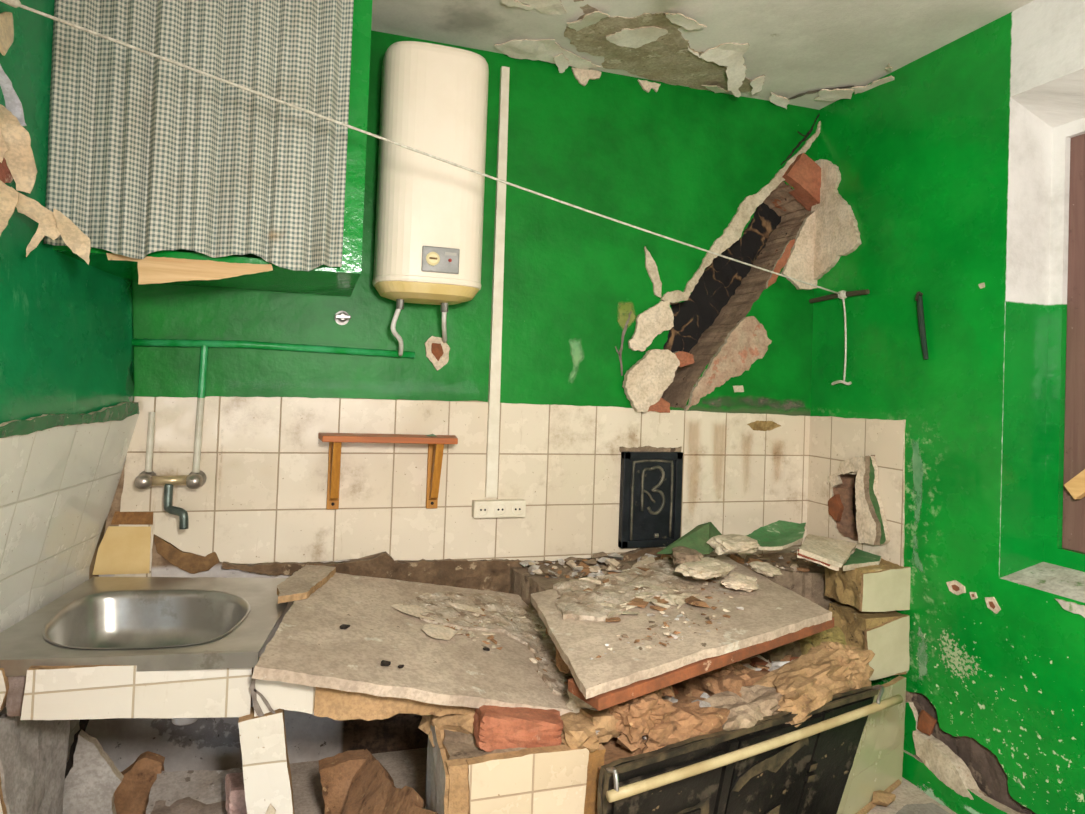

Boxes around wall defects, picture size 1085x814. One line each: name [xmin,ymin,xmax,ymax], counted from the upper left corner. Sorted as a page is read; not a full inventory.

peeling [494,0,894,109]
peeling [0,12,91,265]
flaking render [622,121,862,413]
flaking render [424,336,450,371]
flaking render [828,455,890,545]
flaking render [946,580,1001,614]
peeling [917,627,982,683]
flaking render [903,690,1036,814]